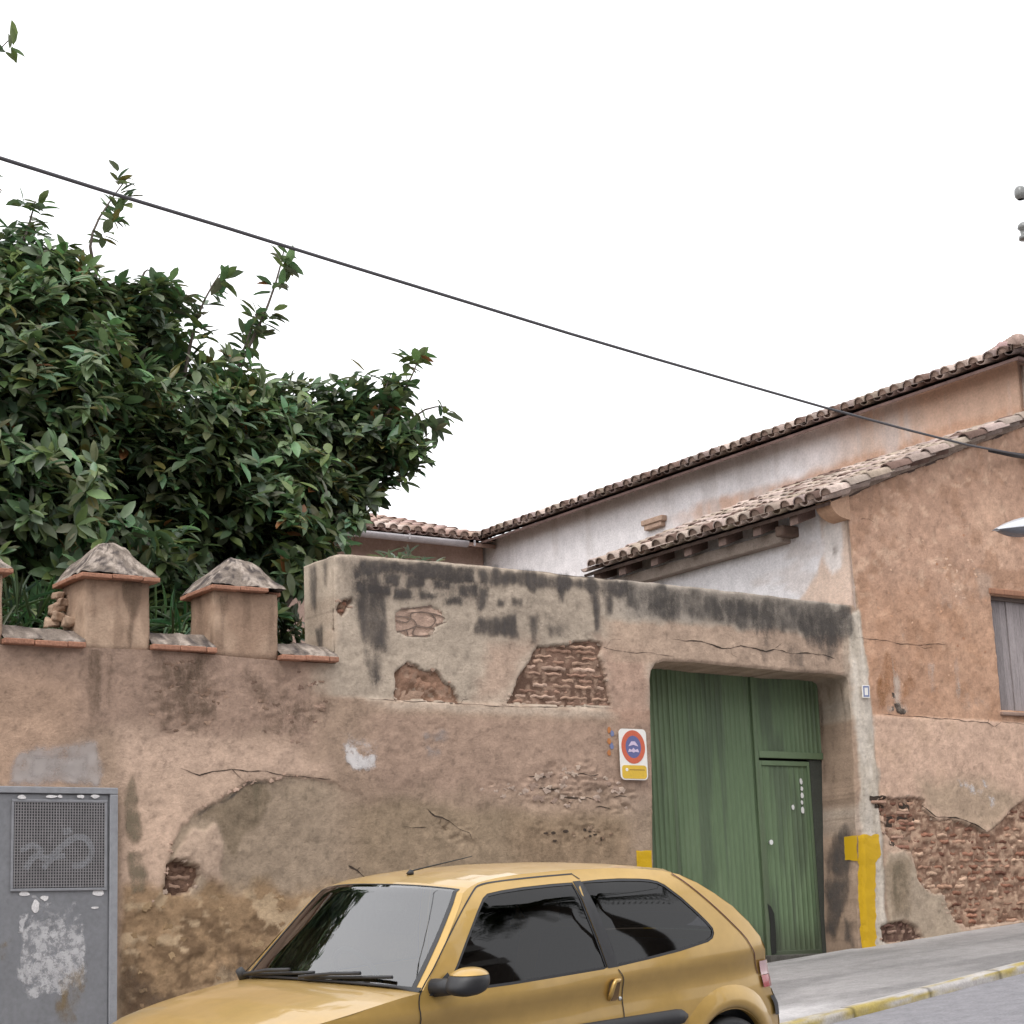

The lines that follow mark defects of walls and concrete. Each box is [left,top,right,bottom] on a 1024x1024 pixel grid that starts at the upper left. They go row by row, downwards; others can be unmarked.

spalling [335,599,353,616]
spalling [395,605,446,637]
spalling [394,662,458,704]
leakage [355,560,637,676]
spalling [502,640,611,707]
crack [604,639,834,659]
leakage [649,583,852,653]
crack [181,768,323,780]
spalling [142,842,198,913]
leakage [826,829,850,940]
spalling [870,794,1024,927]
spalling [879,921,920,943]